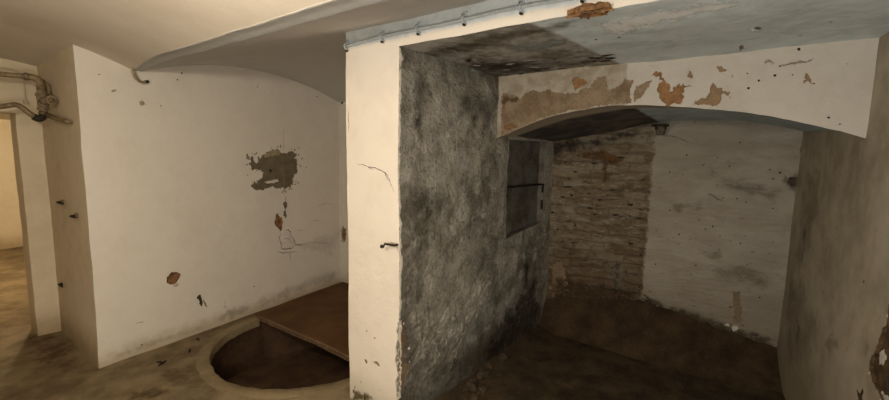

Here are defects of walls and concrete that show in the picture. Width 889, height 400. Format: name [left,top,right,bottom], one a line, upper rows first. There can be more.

spalling [565,1,614,20]
peeling [499,69,732,136]
flaking render [246,145,307,193]
spalling [274,213,288,232]
spalling [166,272,181,285]
leakage [486,262,540,361]
leakage [552,278,772,346]
flaking render [868,305,889,400]